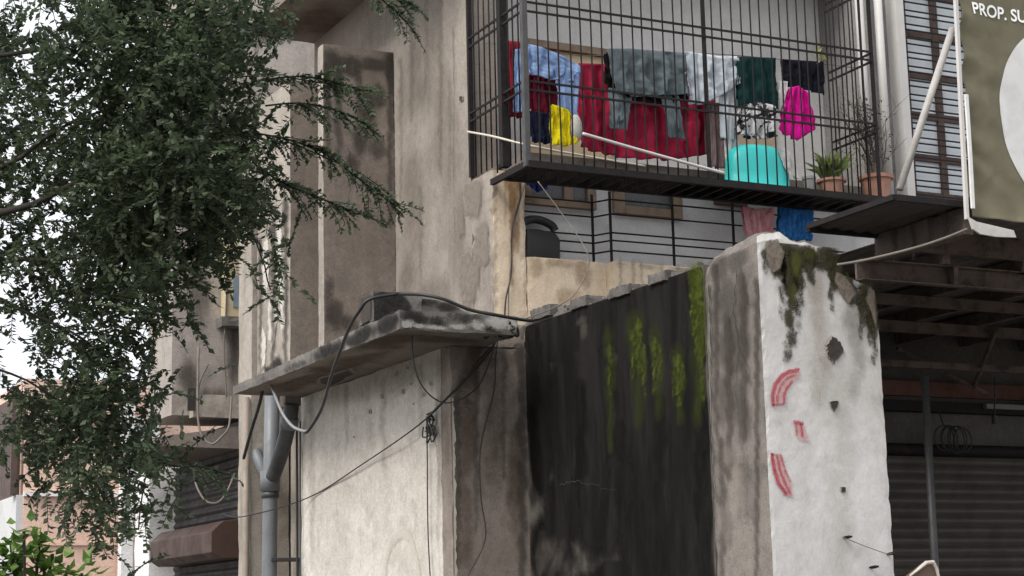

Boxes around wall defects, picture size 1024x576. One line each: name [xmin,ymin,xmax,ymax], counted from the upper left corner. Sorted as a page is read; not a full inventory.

damp [324,50,394,205]
spalling [765,239,785,272]
spalling [834,272,877,327]
damp [181,365,225,395]
damp [229,331,238,381]
spalling [825,335,844,364]
damp [264,245,880,576]